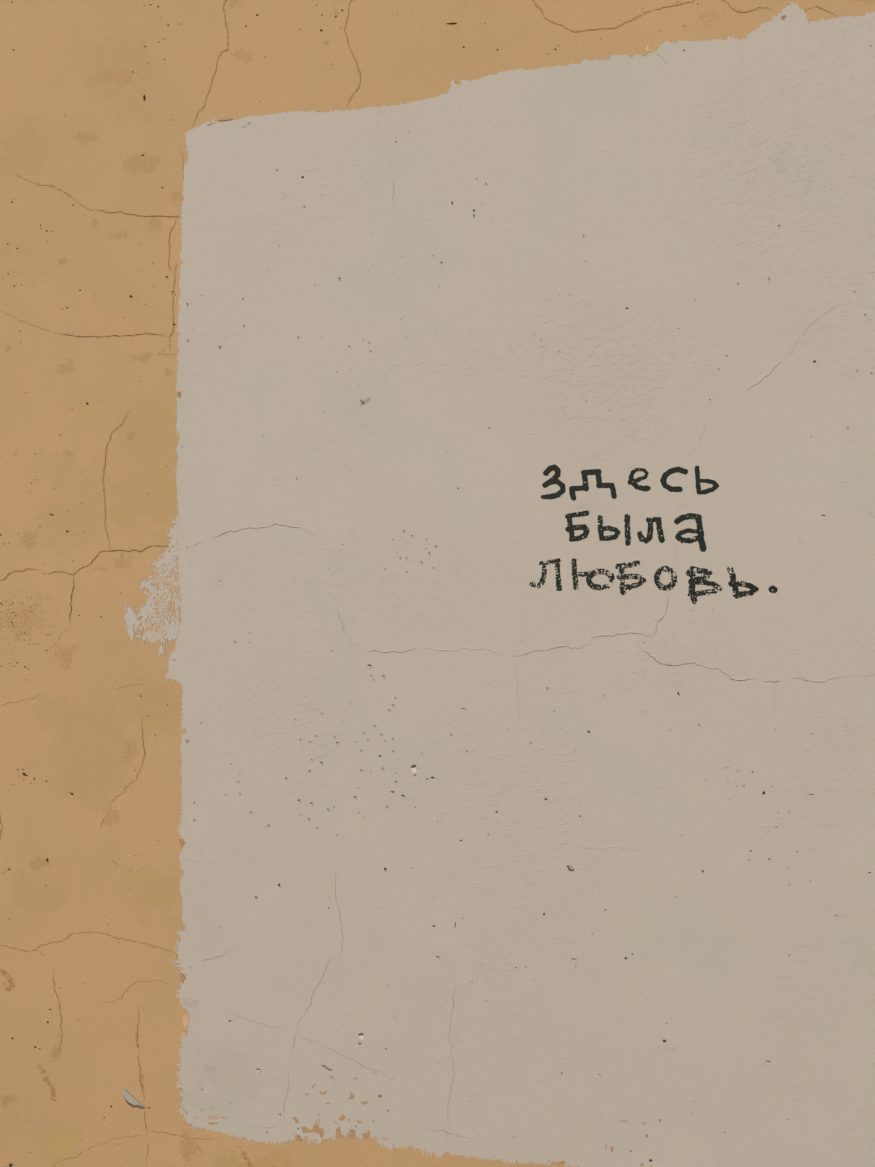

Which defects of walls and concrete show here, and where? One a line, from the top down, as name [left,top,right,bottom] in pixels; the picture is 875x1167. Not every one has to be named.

crack [344,0,361,108]
crack [532,0,694,32]
crack [722,0,770,27]
crack [1,173,181,356]
crack [0,411,317,648]
crack [335,597,871,720]
crack [0,923,175,1055]
crack [53,980,221,1167]
peeling [279,1065,388,1142]